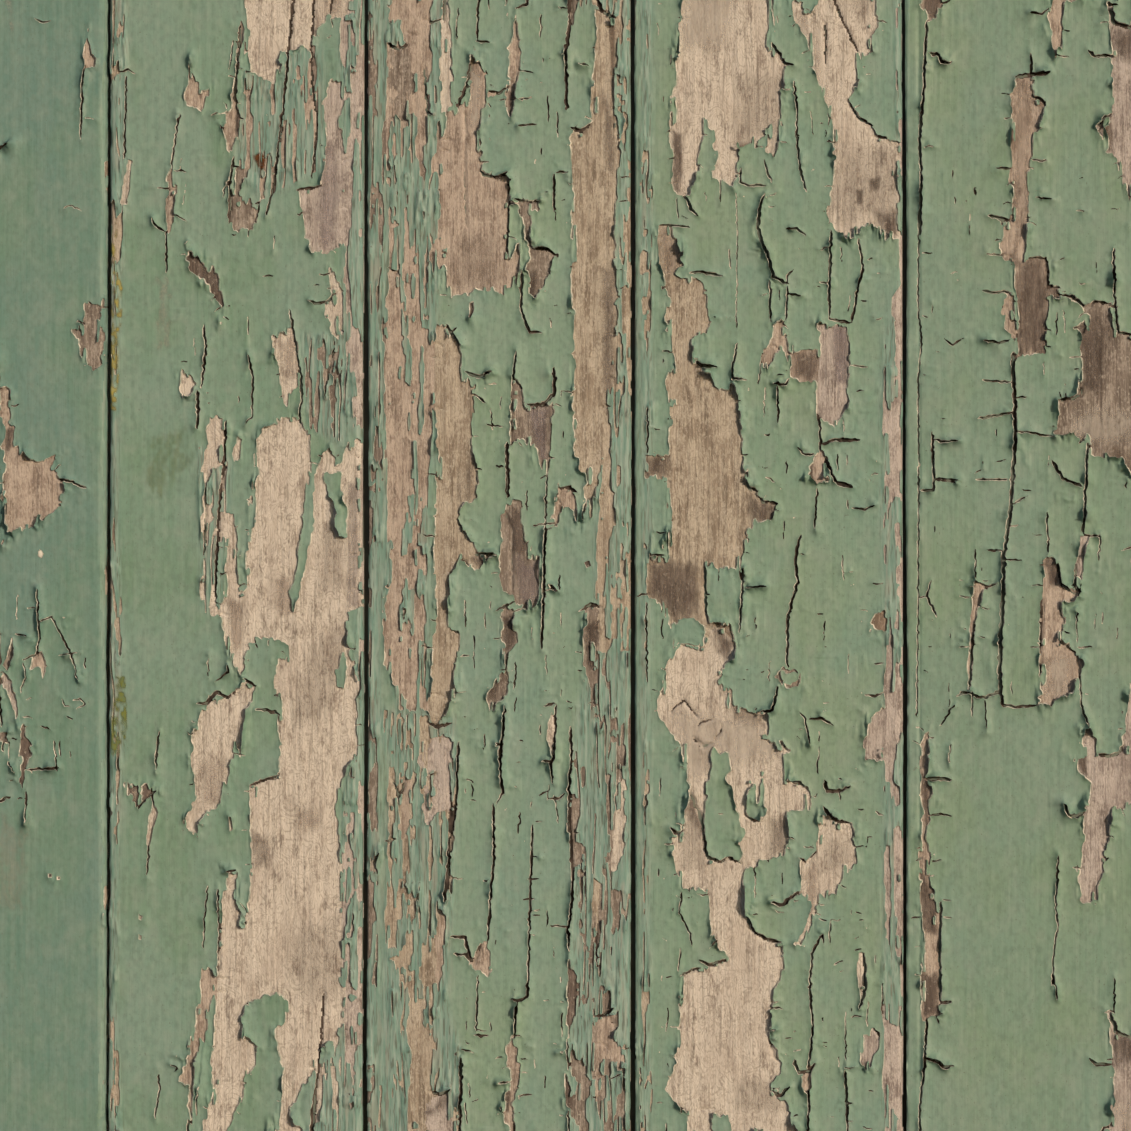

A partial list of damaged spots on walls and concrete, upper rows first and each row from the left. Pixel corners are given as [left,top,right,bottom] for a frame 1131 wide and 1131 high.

crack [0,140,13,153]
peeling [960,0,1131,910]
peeling [152,0,952,1131]
crack [11,586,86,699]
peeling [0,626,58,820]
crack [54,716,73,771]
peeling [1089,979,1131,1131]